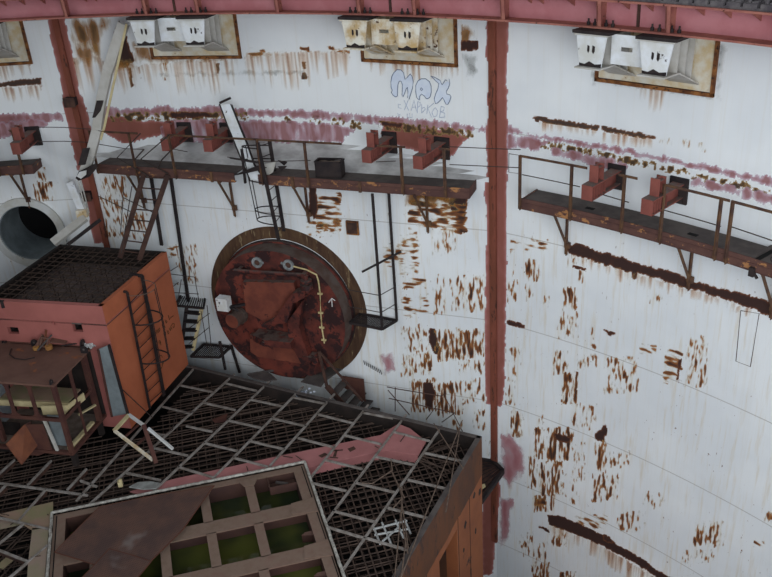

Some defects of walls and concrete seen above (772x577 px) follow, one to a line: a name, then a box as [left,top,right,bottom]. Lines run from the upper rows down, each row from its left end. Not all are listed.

corrosion [73,19,106,73]
corrosion [0,78,42,93]
corrosion [533,116,656,141]
corrosion [540,141,770,194]
corrosion [309,188,342,236]
corrosion [395,195,483,316]
corrosion [558,243,770,339]
corrosion [401,324,485,430]
corrosion [505,347,522,438]
corrosion [663,335,707,387]
corrosion [521,351,670,577]
corrosion [682,523,719,562]